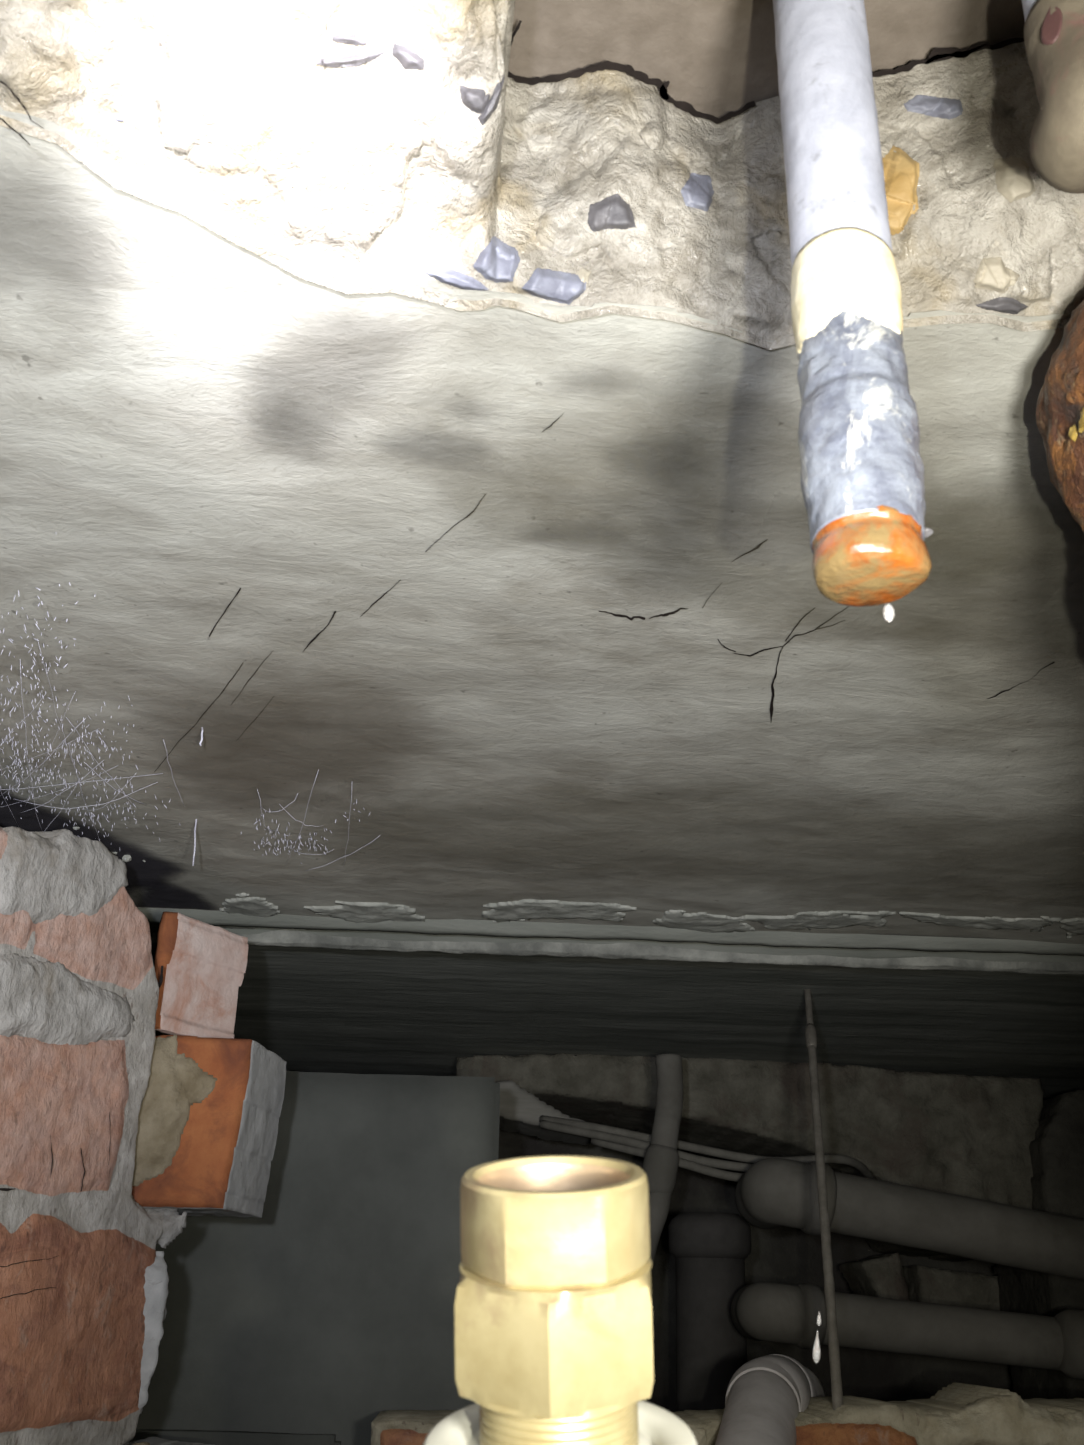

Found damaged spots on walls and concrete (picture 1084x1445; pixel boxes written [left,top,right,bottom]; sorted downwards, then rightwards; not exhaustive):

crack [508,21,756,124]
crack [872,38,1024,77]
spalling [0,0,795,350]
spalling [873,42,1084,332]
crack [599,539,768,620]
crack [718,606,849,721]
crack [988,662,1055,699]